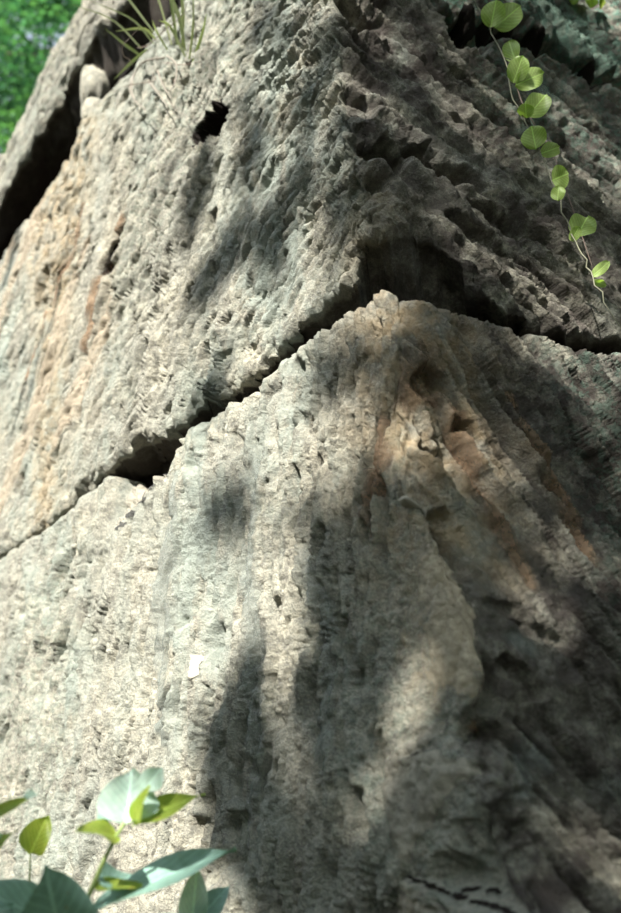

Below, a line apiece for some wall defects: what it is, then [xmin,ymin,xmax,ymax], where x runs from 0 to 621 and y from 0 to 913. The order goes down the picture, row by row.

crack [80,214,124,351]
crack [142,462,172,488]
crack [406,875,517,913]